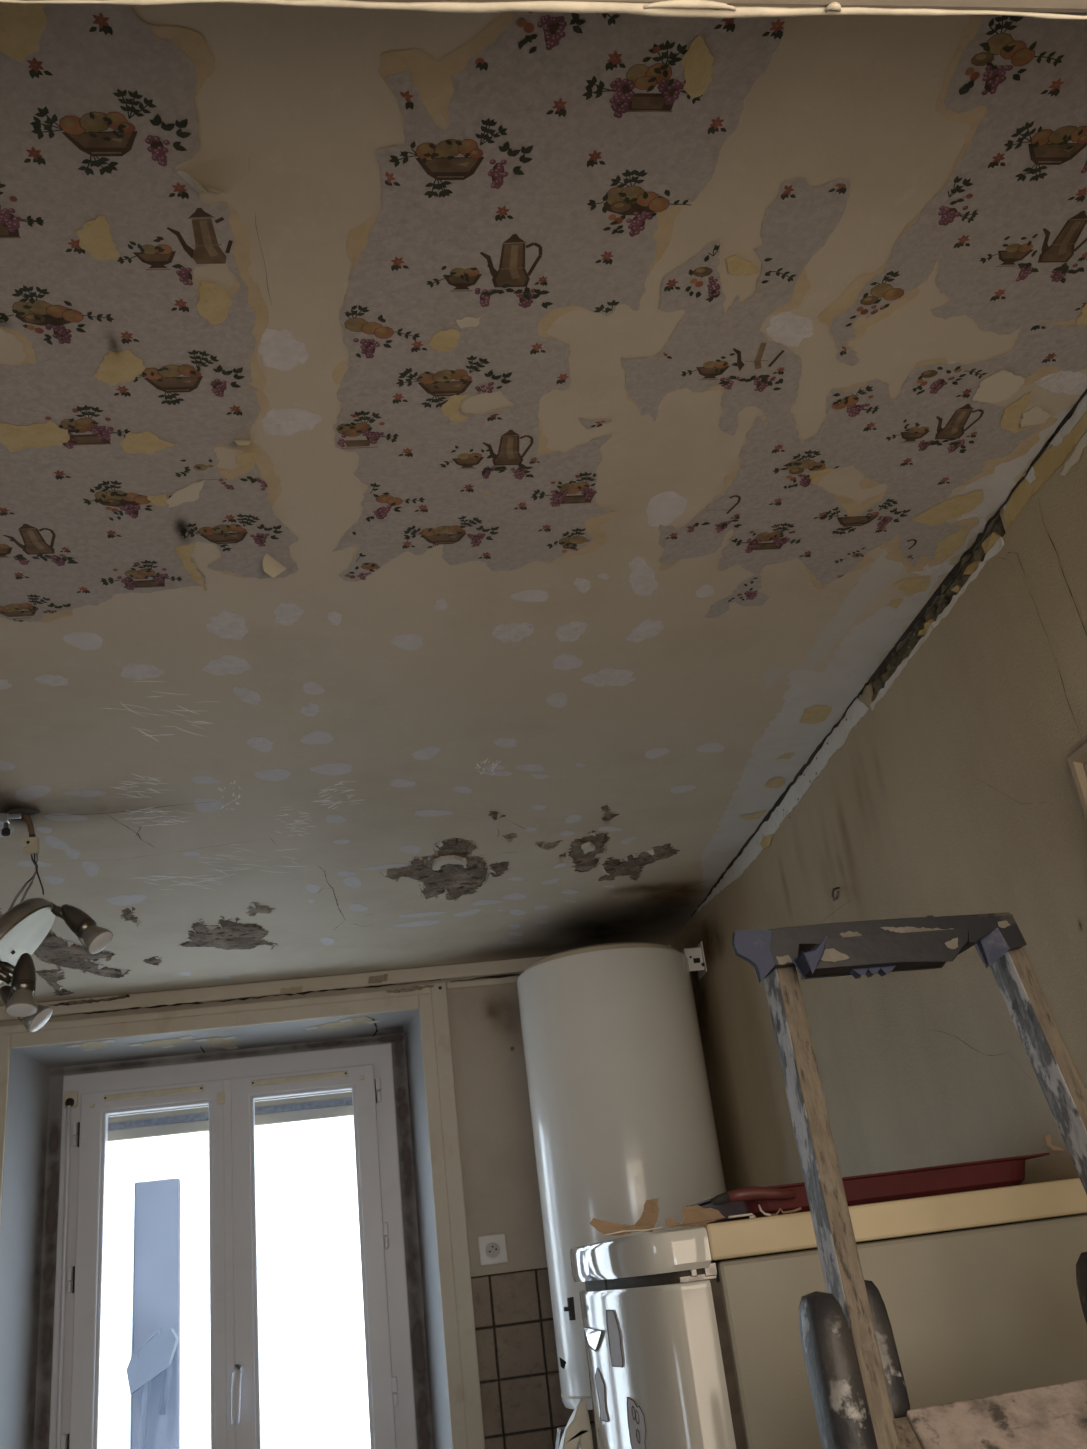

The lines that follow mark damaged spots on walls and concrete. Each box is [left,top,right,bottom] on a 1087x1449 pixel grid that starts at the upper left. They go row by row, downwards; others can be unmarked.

crack [988,389,1087,738]
spalling [181,902,278,950]
crack [318,867,372,930]
spalling [379,838,509,901]
spalling [488,811,518,842]
spalling [535,805,680,882]
spalling [34,930,162,1006]